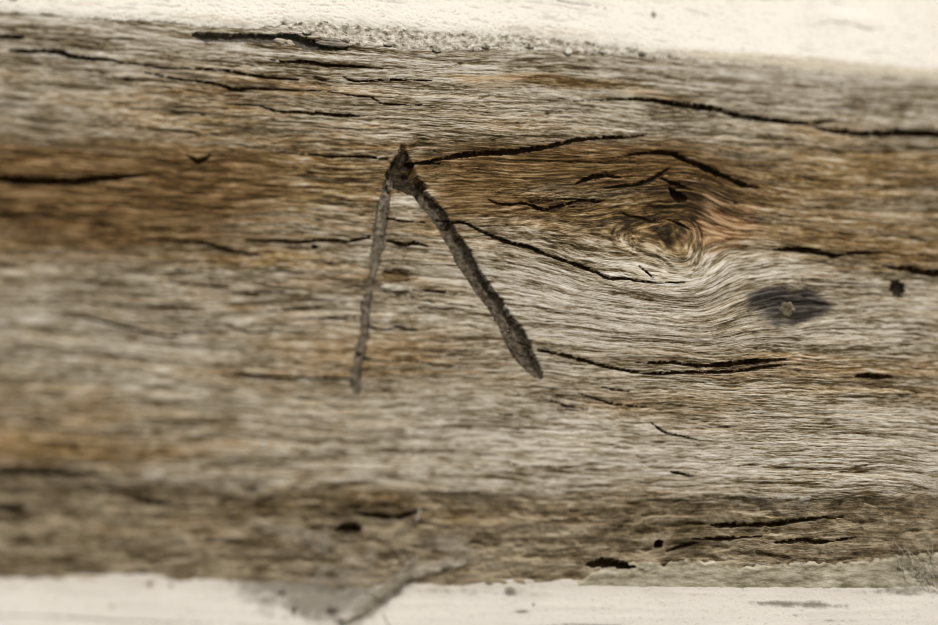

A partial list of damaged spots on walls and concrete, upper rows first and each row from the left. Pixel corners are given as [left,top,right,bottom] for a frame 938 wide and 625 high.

crack [0,34,432,117]
crack [0,210,56,218]
crack [0,173,149,187]
crack [186,154,211,165]
crack [269,134,759,230]
crack [127,217,685,284]
crack [414,287,446,295]
crack [507,341,788,440]